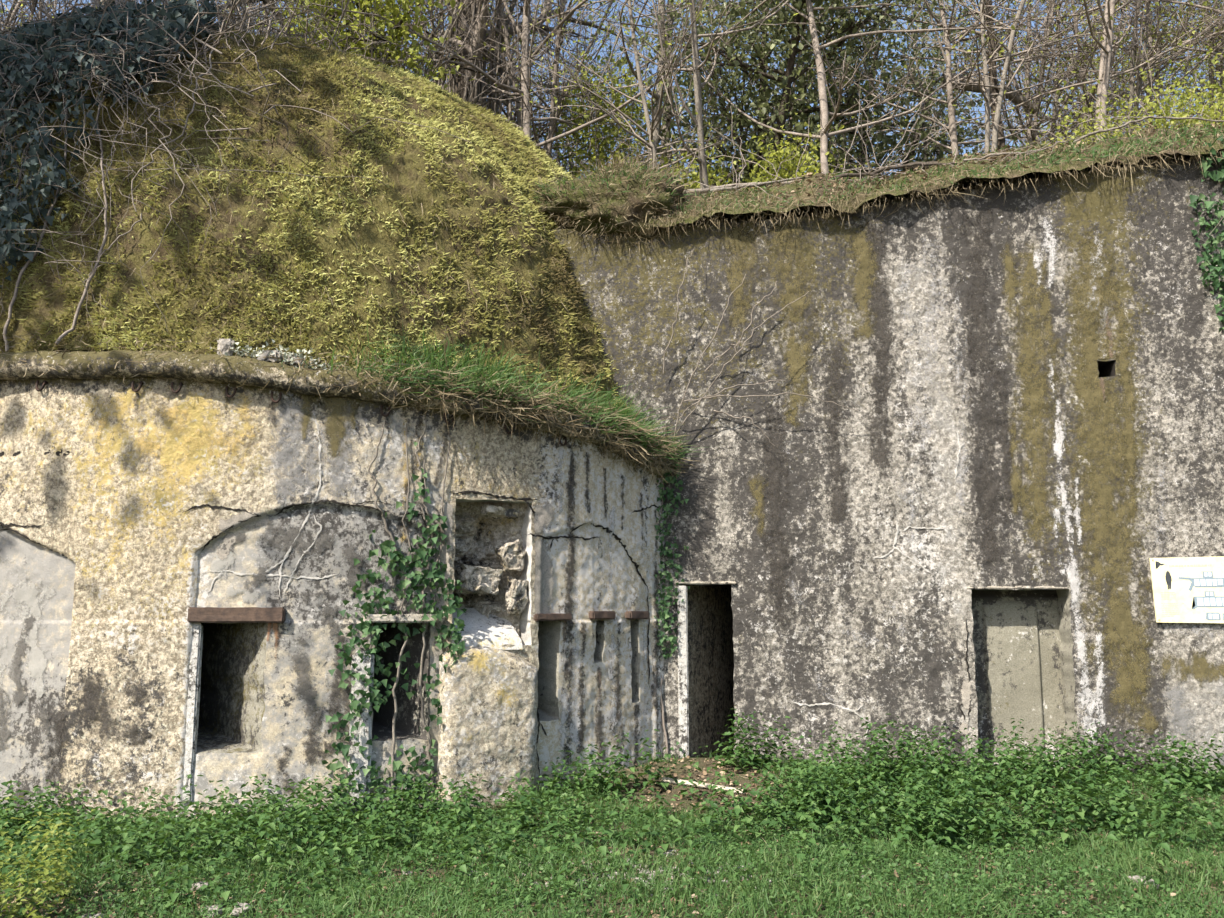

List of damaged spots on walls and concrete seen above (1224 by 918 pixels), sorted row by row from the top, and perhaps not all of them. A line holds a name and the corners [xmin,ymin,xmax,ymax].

water stain [1033,218,1060,289]
water stain [43,671,153,785]
crack [182,407,650,688]
water stain [557,446,660,779]
crack [634,504,663,518]
water stain [749,403,796,626]
water stain [819,344,850,524]
water stain [846,208,1022,562]
water stain [1048,363,1107,756]
water stain [1089,237,1137,518]
water stain [1123,646,1224,741]